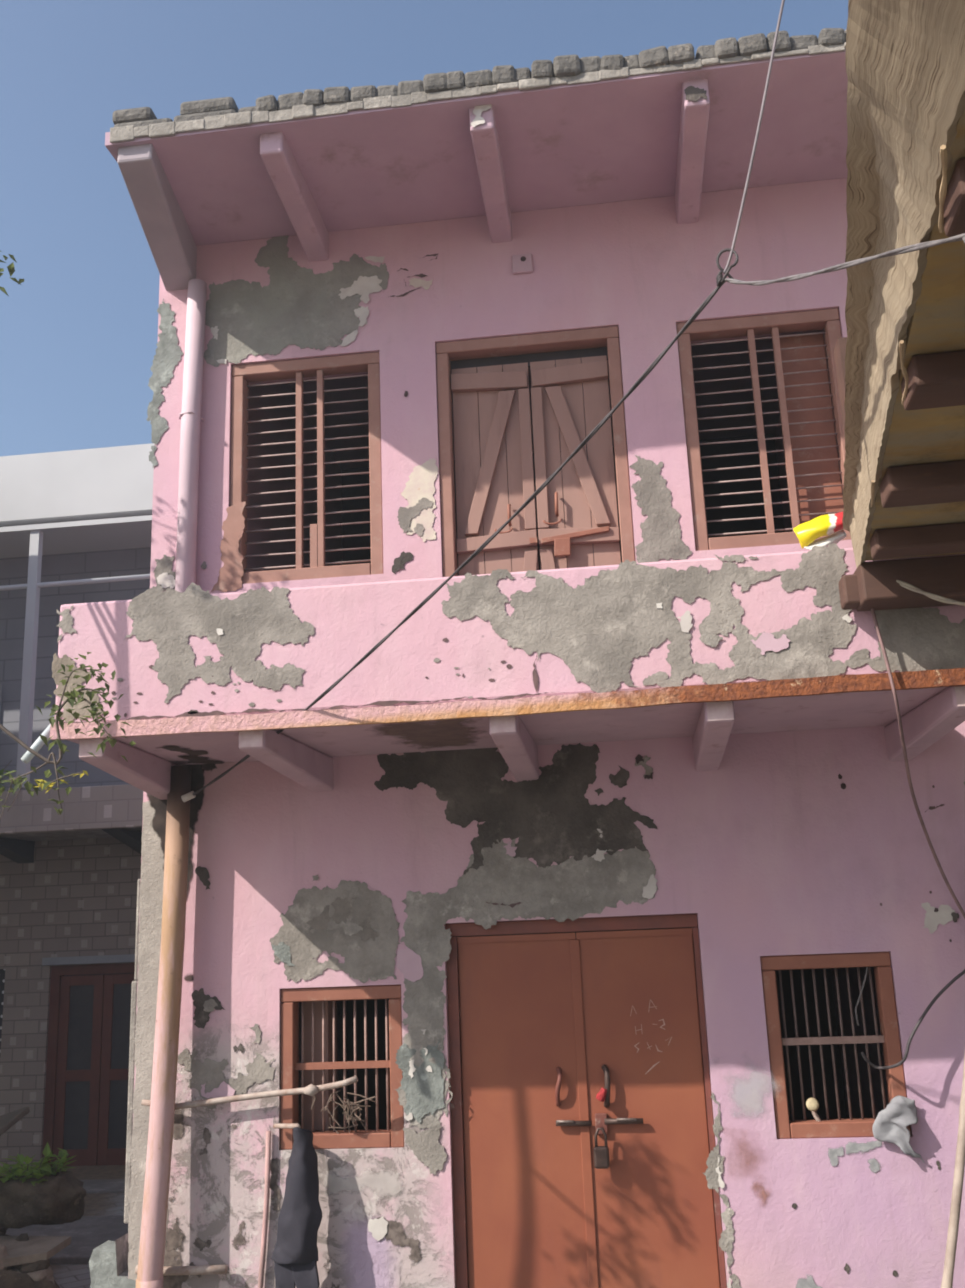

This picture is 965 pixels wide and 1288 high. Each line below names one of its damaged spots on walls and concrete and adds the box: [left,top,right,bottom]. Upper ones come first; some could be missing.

flaking render [204,235,389,367]
peeling [146,299,183,467]
peeling [397,459,439,542]
peeling [123,502,315,703]
peeling [441,455,965,693]
flaking render [269,743,658,1175]
peeling [178,1024,275,1110]
peeling [193,1238,212,1251]
peeling [199,1127,211,1155]
peeling [270,1158,281,1211]
peeling [703,1092,741,1288]